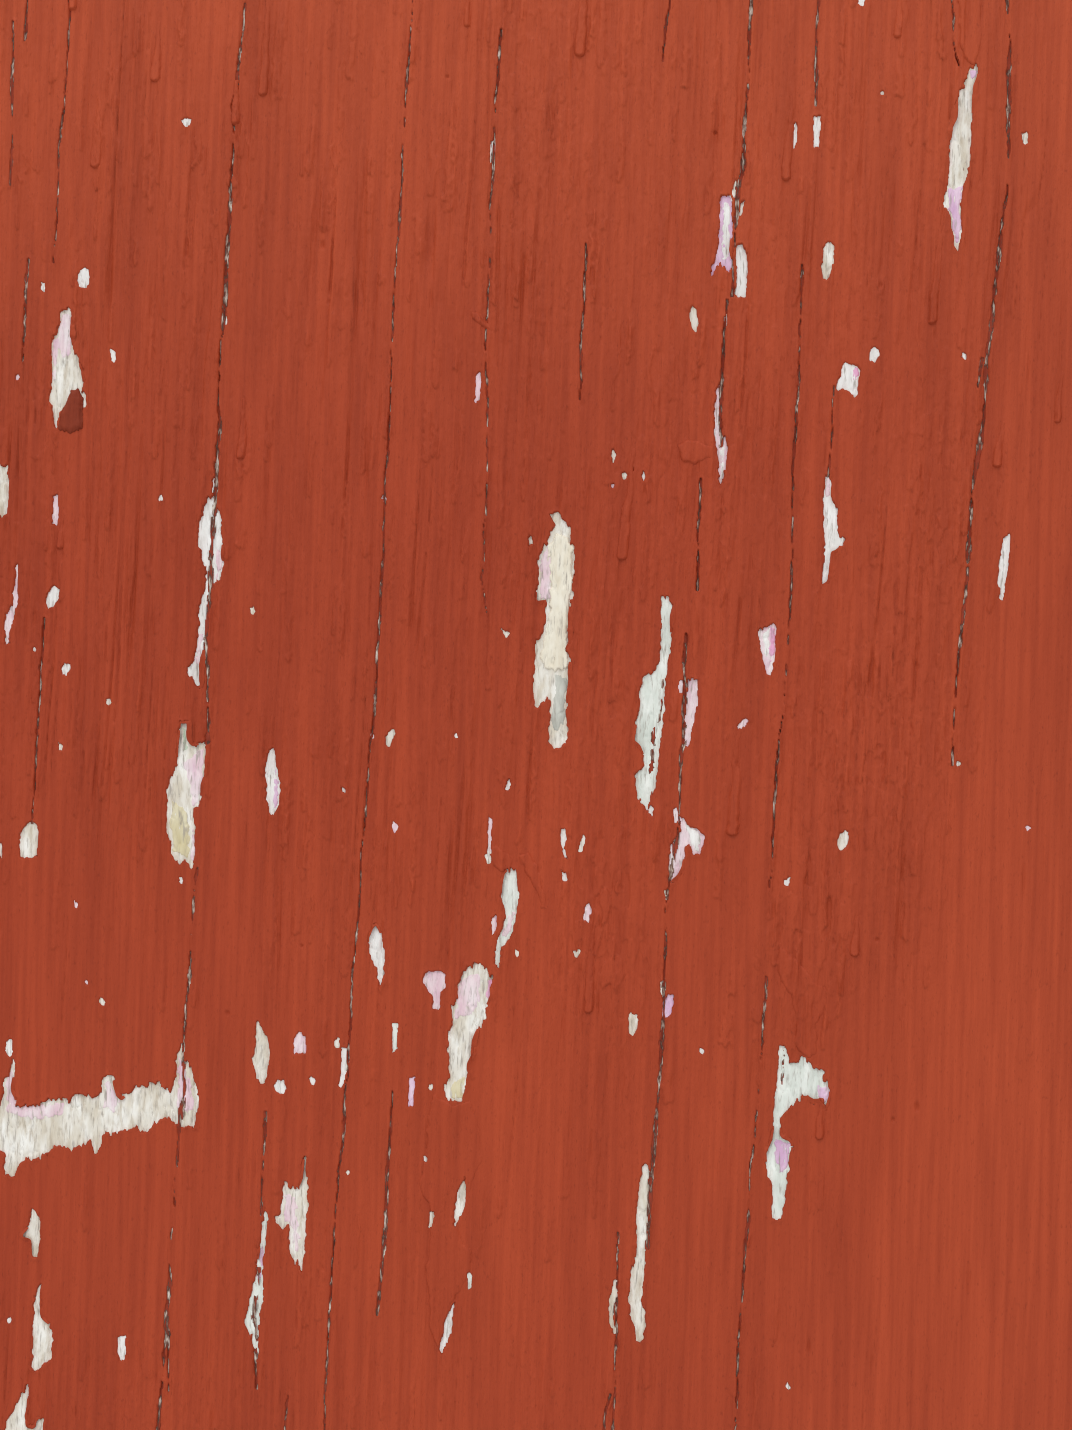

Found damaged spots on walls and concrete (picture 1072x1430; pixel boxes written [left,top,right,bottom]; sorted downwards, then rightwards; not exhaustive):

crack [718,0,753,447]
crack [951,0,1012,766]
peeling [166,720,206,884]
peeling [529,512,575,749]
peeling [631,596,698,816]
crack [695,478,703,591]
peeling [0,1039,199,1177]
crack [156,868,198,1430]
peeling [245,1156,310,1353]
peeling [408,817,519,1106]
crack [603,633,688,1430]
peeling [763,1046,831,1220]